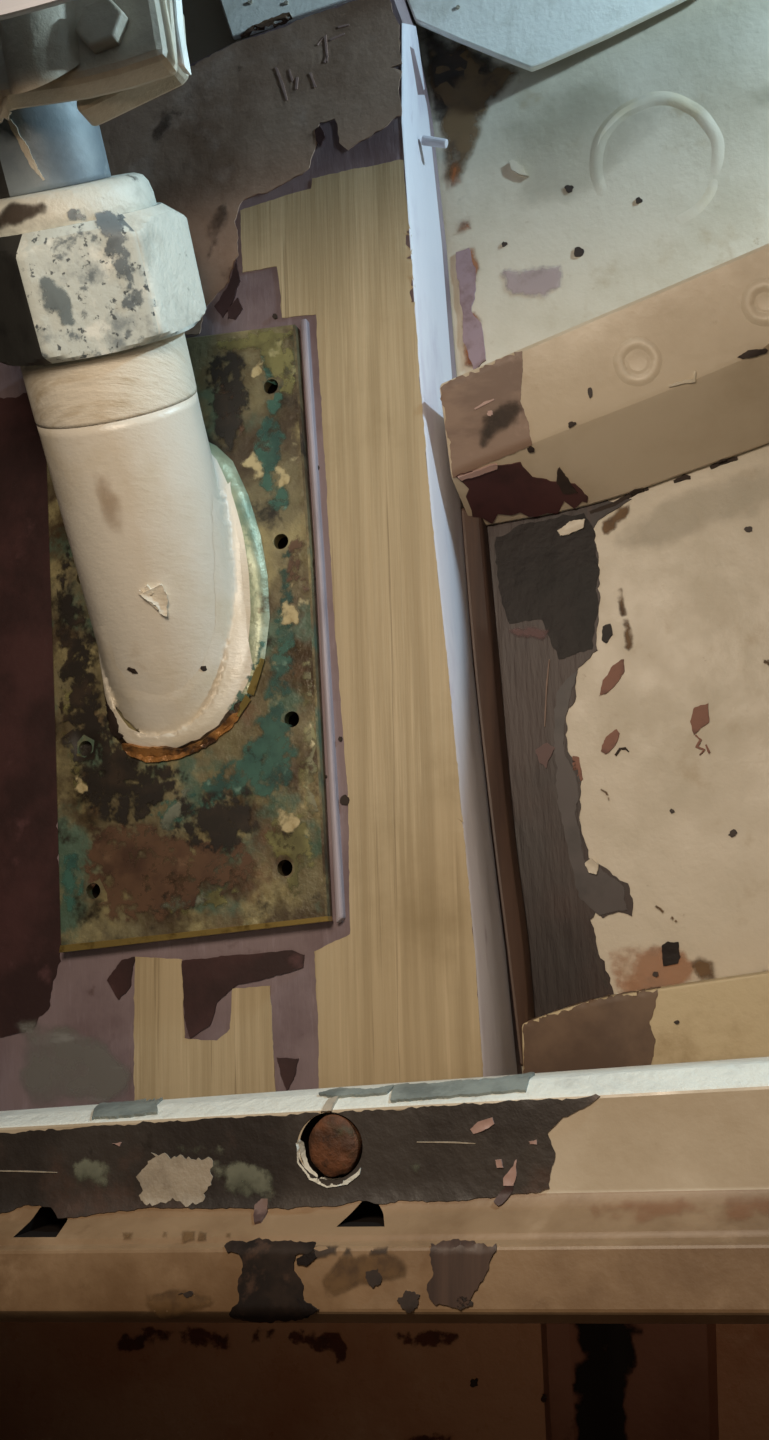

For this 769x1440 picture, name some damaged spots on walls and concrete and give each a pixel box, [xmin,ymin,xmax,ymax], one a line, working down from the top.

peeling [0,160,600,1323]
peeling [455,446,633,1017]
corrosion [118,1327,227,1351]
corrosion [253,1329,347,1363]
corrosion [397,1331,458,1347]
damp [573,1324,642,1440]